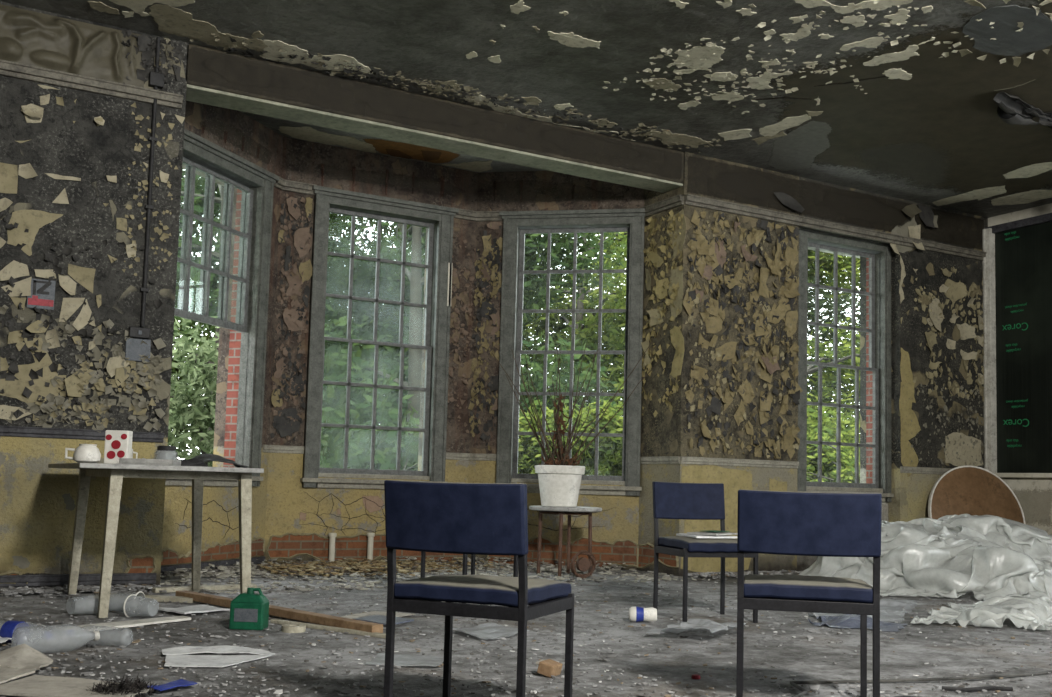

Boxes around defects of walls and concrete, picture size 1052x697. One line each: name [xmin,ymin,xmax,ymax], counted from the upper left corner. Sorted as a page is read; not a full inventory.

peeling [21,84,77,123]
peeling [88,0,823,153]
peeling [602,0,1052,114]
peeling [0,103,185,433]
peeling [270,193,313,441]
peeling [448,221,503,450]
peeling [641,209,803,459]
peeling [911,266,985,466]
peeling [890,162,1052,255]